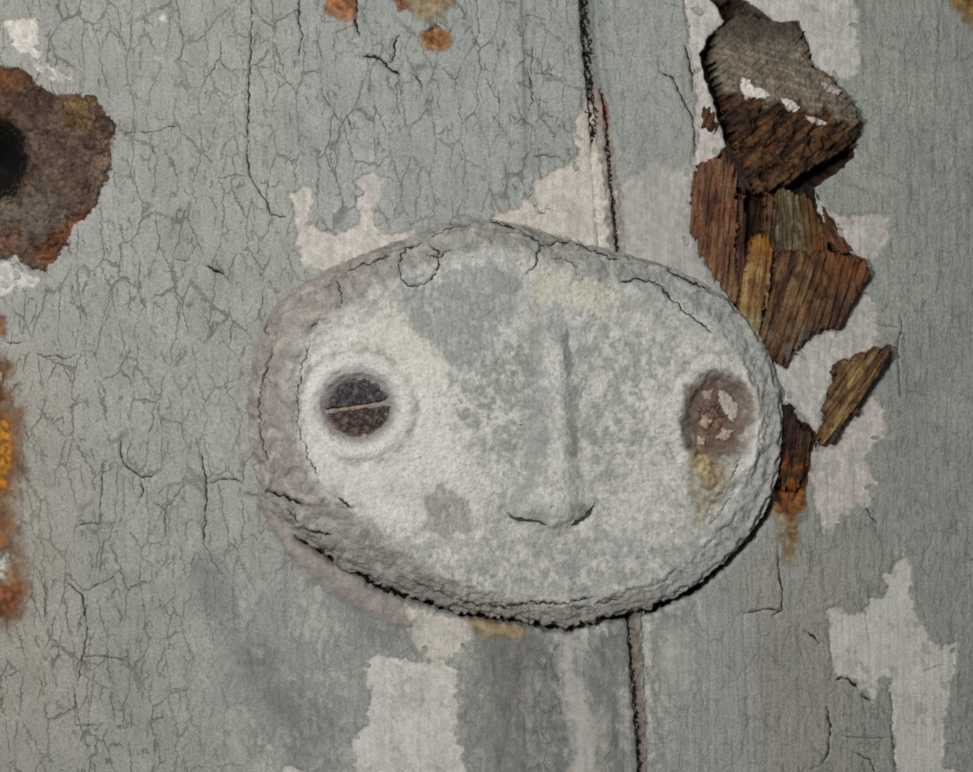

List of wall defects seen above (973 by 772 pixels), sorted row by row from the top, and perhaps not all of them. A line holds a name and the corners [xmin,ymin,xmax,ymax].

rust [0,65,116,272]
crack [176,0,285,241]
rust [397,0,454,52]
crack [333,0,711,332]
peeling [491,0,861,305]
rust [0,361,28,625]
crack [268,491,334,562]
peeling [351,603,473,772]
crack [355,505,769,772]
rust [684,374,753,524]
peeling [736,140,890,542]
peeling [824,551,958,772]